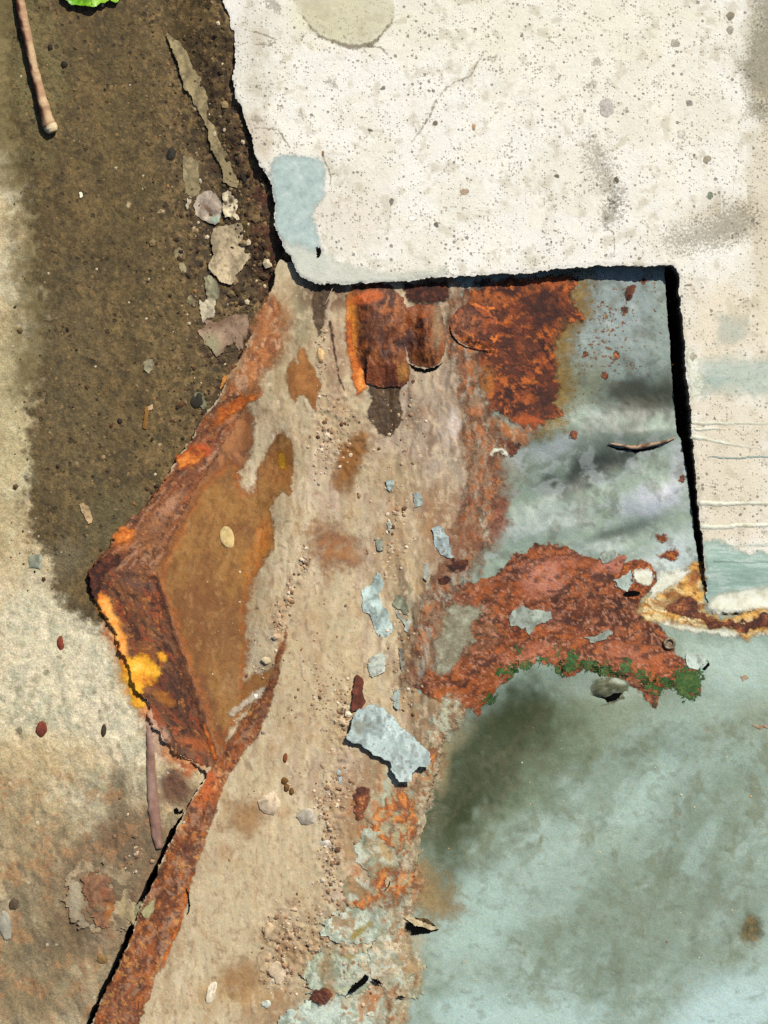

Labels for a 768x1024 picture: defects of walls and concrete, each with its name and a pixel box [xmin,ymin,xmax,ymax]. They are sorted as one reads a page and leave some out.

water stain [0,0,292,625]
rust [345,271,596,463]
peeling [413,492,423,508]
rust [88,294,321,1024]
peeling [346,521,705,782]
rust [81,870,116,928]
crack [87,774,207,1024]
rust [353,785,418,856]
rust [345,865,463,917]